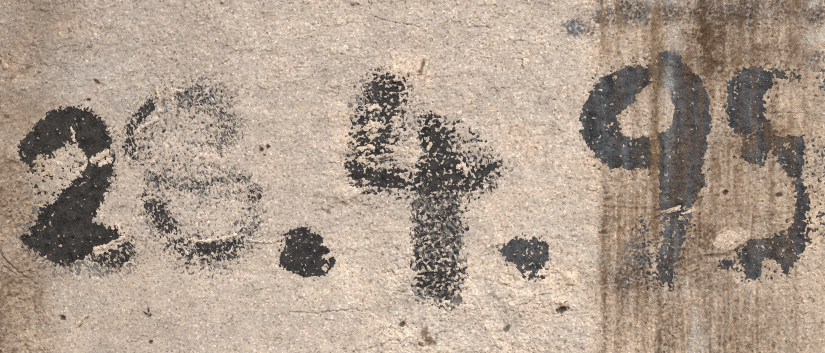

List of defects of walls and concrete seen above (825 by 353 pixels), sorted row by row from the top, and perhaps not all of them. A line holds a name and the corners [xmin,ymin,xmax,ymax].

damp [652,0,765,117]
damp [613,187,662,321]
damp [680,128,753,266]
damp [672,298,762,353]